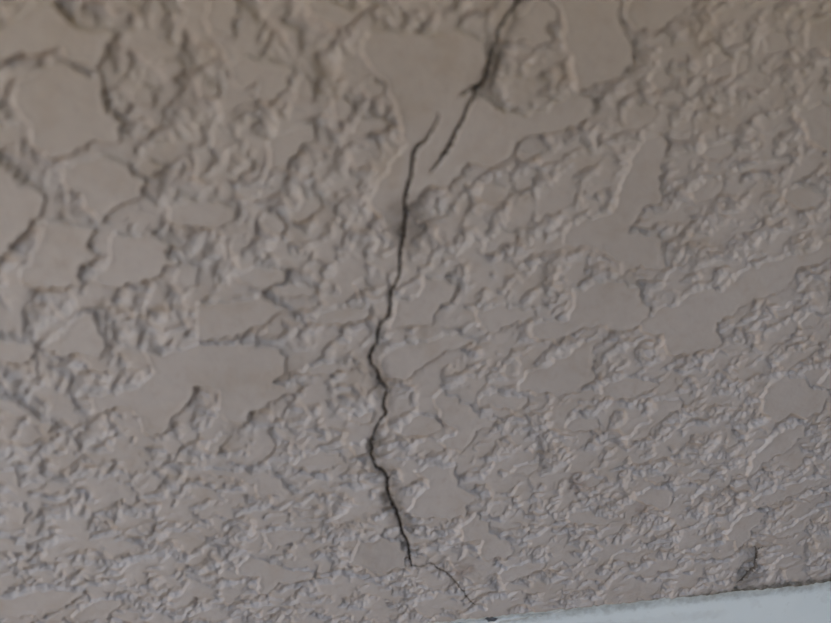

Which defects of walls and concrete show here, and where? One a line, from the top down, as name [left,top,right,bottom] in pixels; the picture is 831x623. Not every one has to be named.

crack [368,0,522,604]